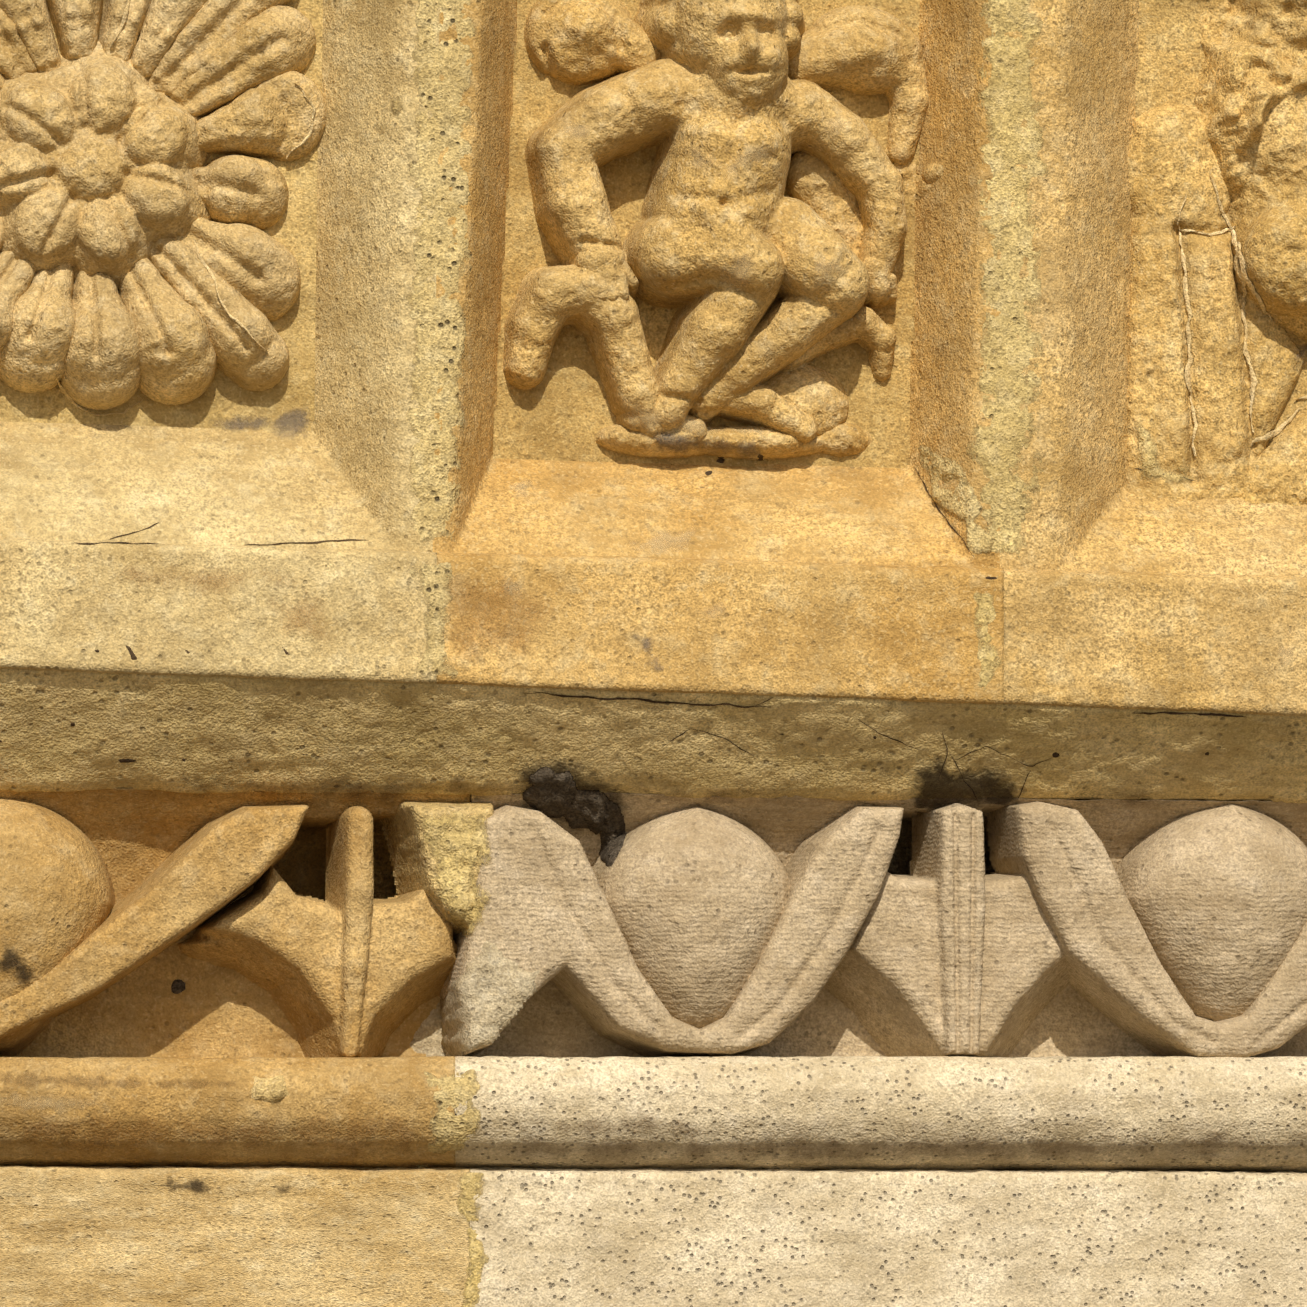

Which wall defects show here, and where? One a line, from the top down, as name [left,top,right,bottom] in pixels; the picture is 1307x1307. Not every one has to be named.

crack [527,692,775,757]
crack [857,718,1059,801]